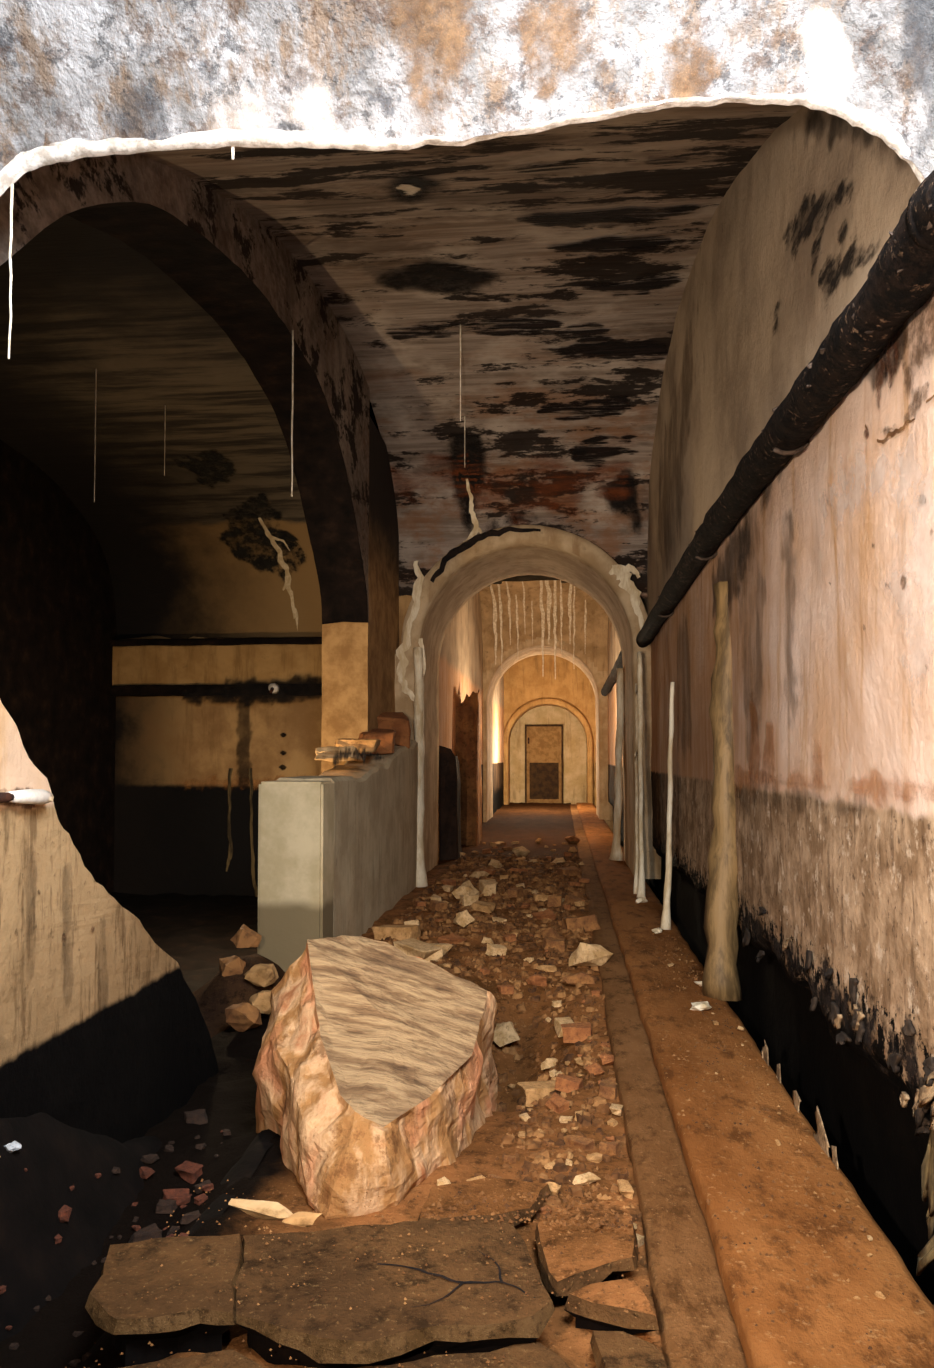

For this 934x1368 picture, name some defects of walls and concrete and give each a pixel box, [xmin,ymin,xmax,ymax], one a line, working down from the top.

mould [219,493,305,580]
damp [463,479,482,542]
spalling [741,895,934,1276]
crack [377,1250,535,1307]